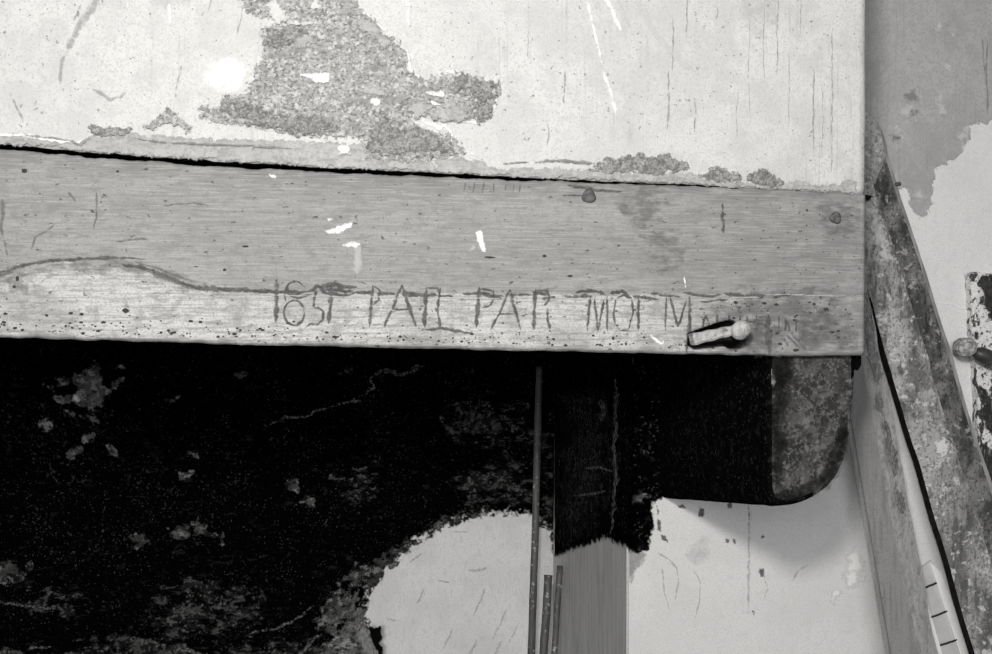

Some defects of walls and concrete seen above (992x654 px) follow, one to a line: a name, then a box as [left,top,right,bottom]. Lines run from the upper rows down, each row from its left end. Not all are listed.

spalling [0,0,857,194]
peeling [865,0,992,217]
peeling [42,378,99,460]
peeling [178,451,199,480]
peeling [285,478,316,508]
peeling [329,459,380,504]
peeling [429,457,555,530]
peeling [128,533,150,550]
peeling [190,521,225,546]
peeling [0,560,83,618]
peeling [51,634,189,654]
spalling [216,587,383,654]